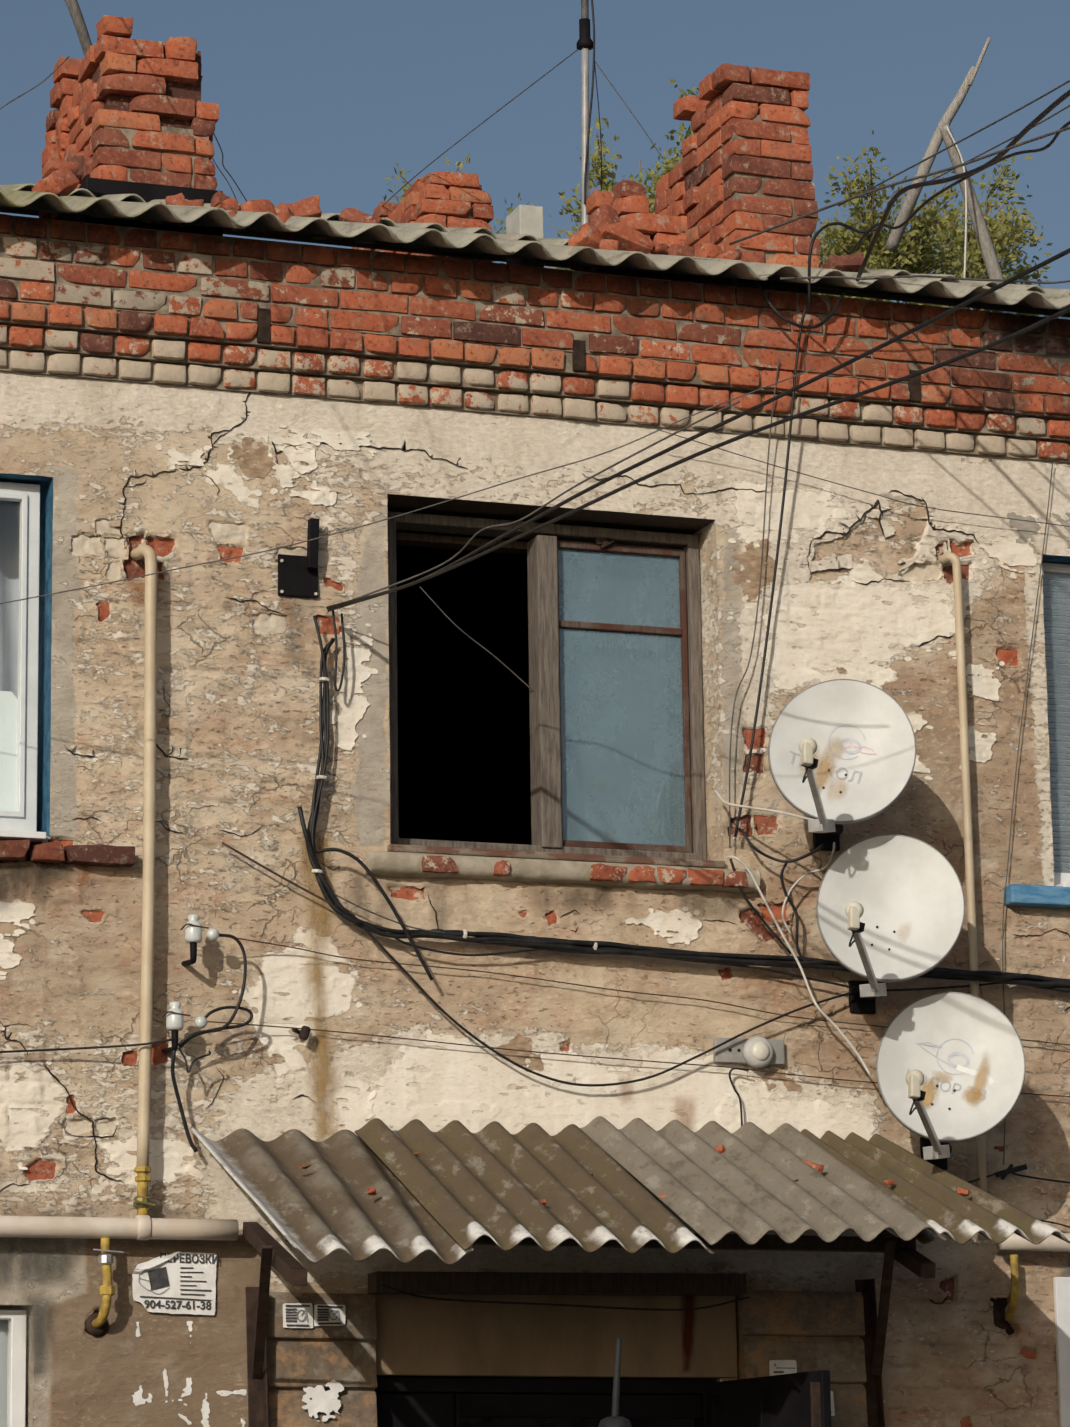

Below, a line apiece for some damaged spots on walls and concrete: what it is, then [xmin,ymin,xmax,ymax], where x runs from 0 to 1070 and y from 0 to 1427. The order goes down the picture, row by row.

crack [108,392,254,538]
crack [272,433,467,480]
peeling [717,475,1070,701]
peeling [313,612,378,751]
spalling [742,725,770,775]
peeling [906,708,934,733]
peeling [959,723,997,770]
peeling [0,899,36,980]
crack [0,1008,124,1183]
peeling [232,922,363,1084]
leakage [311,956,332,1137]
peeling [625,907,702,945]